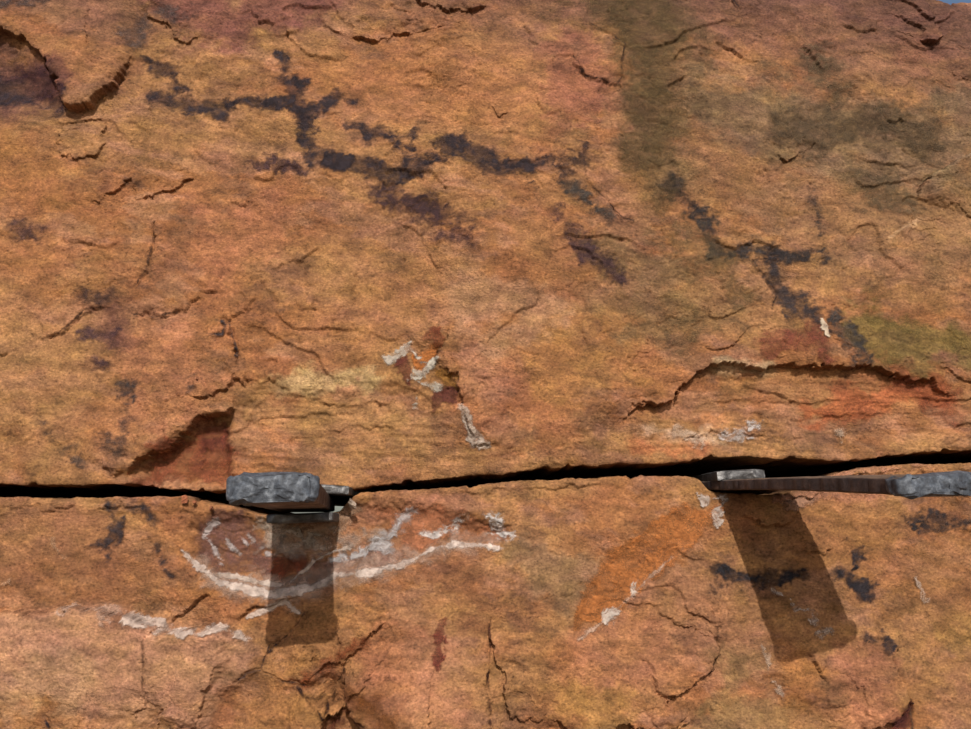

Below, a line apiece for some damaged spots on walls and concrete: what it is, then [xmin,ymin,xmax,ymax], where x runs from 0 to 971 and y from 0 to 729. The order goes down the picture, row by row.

damp [0,65,66,113]
damp [772,46,945,162]
damp [117,18,627,286]
damp [591,0,873,366]
damp [907,508,971,534]
damp [712,563,807,591]
damp [834,546,880,603]